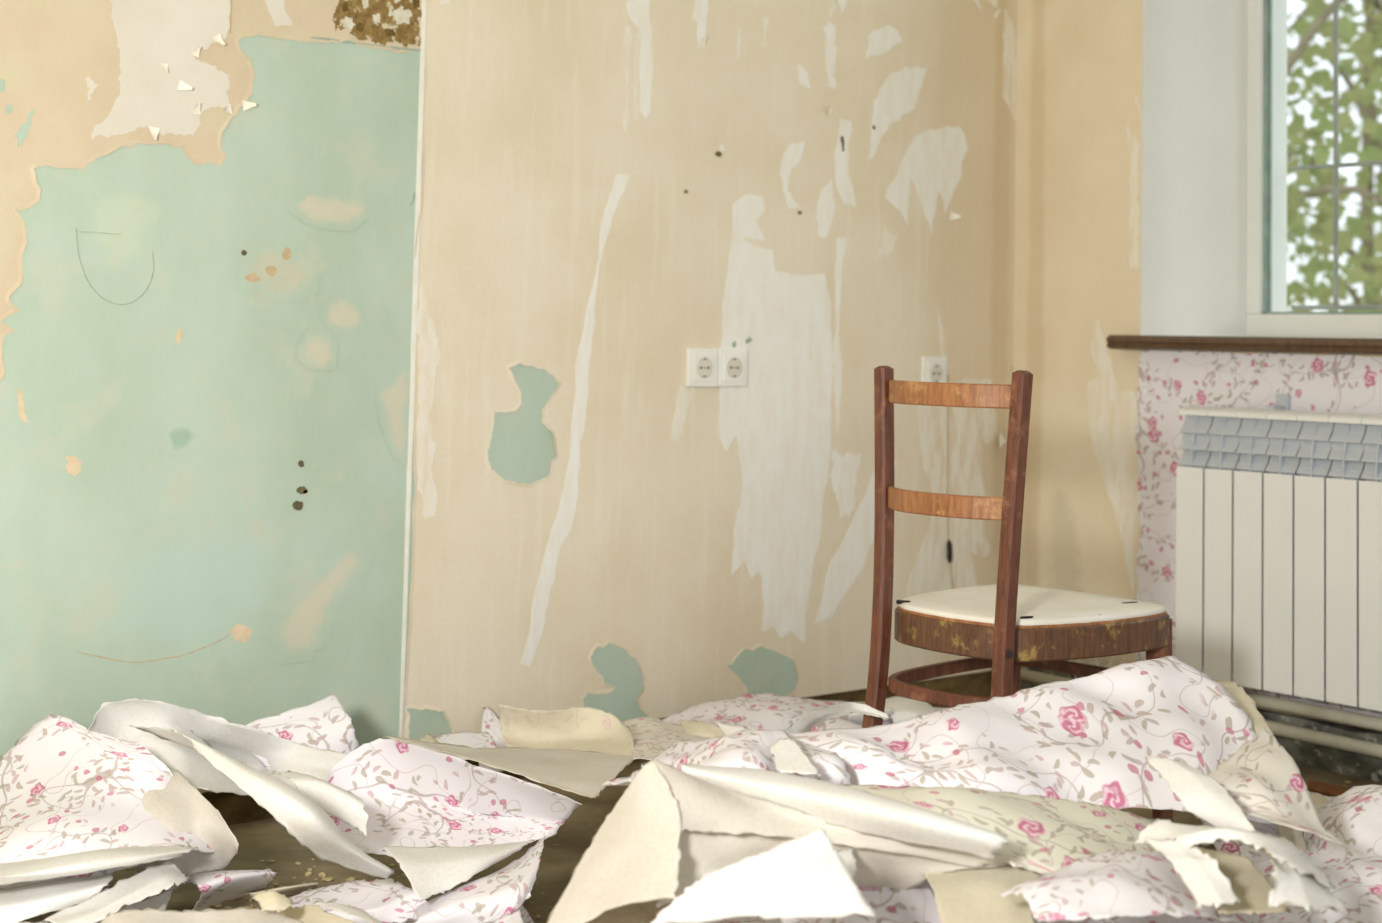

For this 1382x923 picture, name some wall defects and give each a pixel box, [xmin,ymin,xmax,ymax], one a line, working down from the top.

peeling [0,0,455,757]
peeling [484,360,561,488]
peeling [580,639,649,722]
peeling [725,642,800,696]